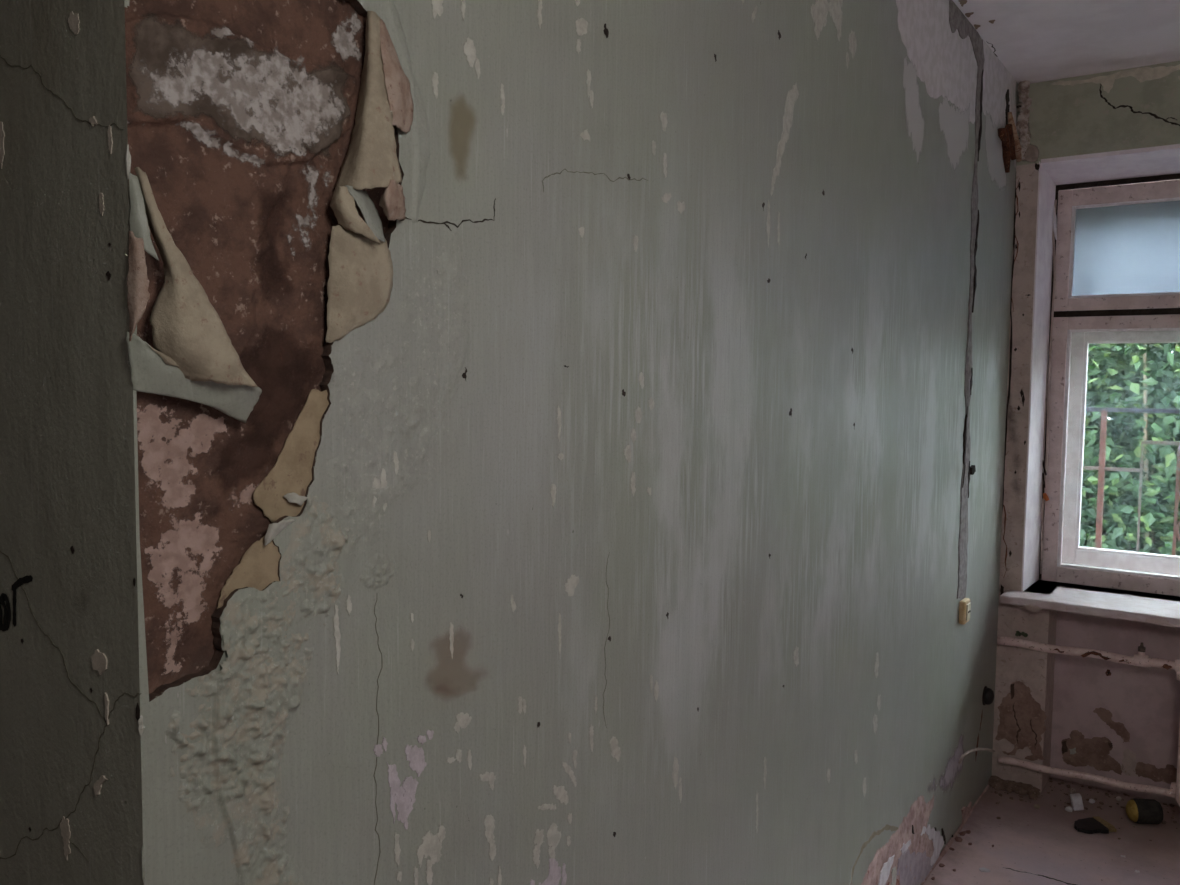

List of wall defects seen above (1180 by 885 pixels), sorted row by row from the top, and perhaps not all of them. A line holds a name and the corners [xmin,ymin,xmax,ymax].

crack [0,55,124,130]
spalling [1005,80,1039,162]
crack [1099,84,1180,126]
flaking render [89,0,439,694]
crack [0,551,140,862]
spalling [136,702,145,735]
spalling [995,681,1046,761]
spalling [1061,707,1177,784]
peeling [390,730,434,885]
peeling [530,785,572,885]
flaking render [861,794,953,885]